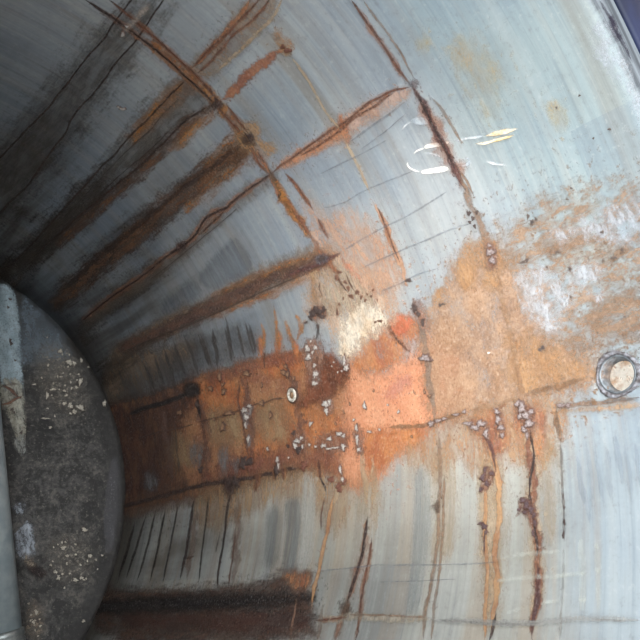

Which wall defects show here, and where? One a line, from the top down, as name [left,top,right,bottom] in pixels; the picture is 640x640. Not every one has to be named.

corrosion [190,0,281,78]
corrosion [220,32,295,102]
crack [82,0,339,321]
corrosion [273,87,408,173]
crack [347,145,368,188]
crack [375,205,413,283]
peeling [212,369,273,488]
peeling [274,418,381,476]
corrosion [111,175,640,640]
crack [317,299,639,640]